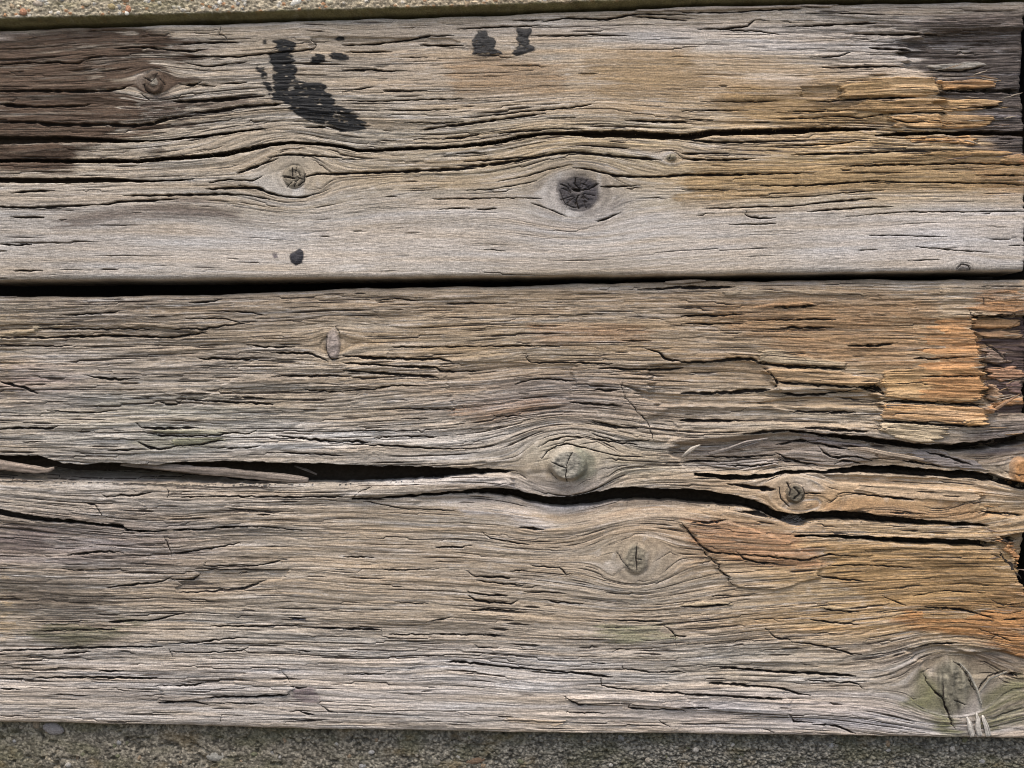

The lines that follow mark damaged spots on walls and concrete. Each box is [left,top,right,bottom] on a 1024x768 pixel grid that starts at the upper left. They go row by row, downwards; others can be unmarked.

peeling [836,62,1024,163]
peeling [755,318,1024,470]
crack [0,283,1024,736]